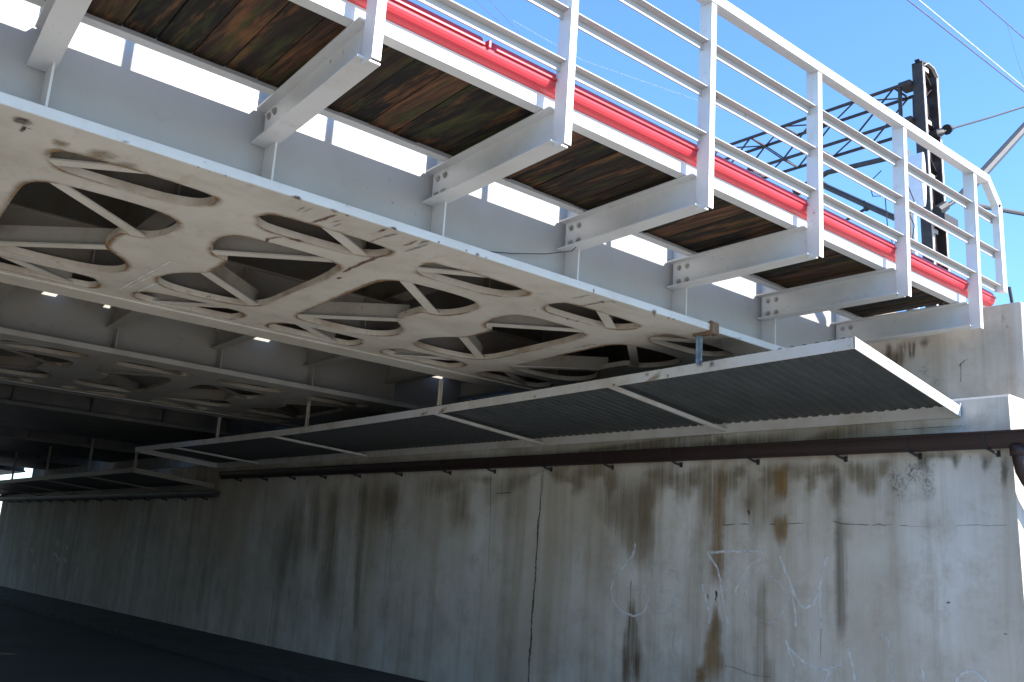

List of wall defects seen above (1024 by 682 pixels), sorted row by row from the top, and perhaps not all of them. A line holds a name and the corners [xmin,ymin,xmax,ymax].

corrosion [775,519,786,538]
crack [528,475,543,682]
corrosion [698,613,719,681]